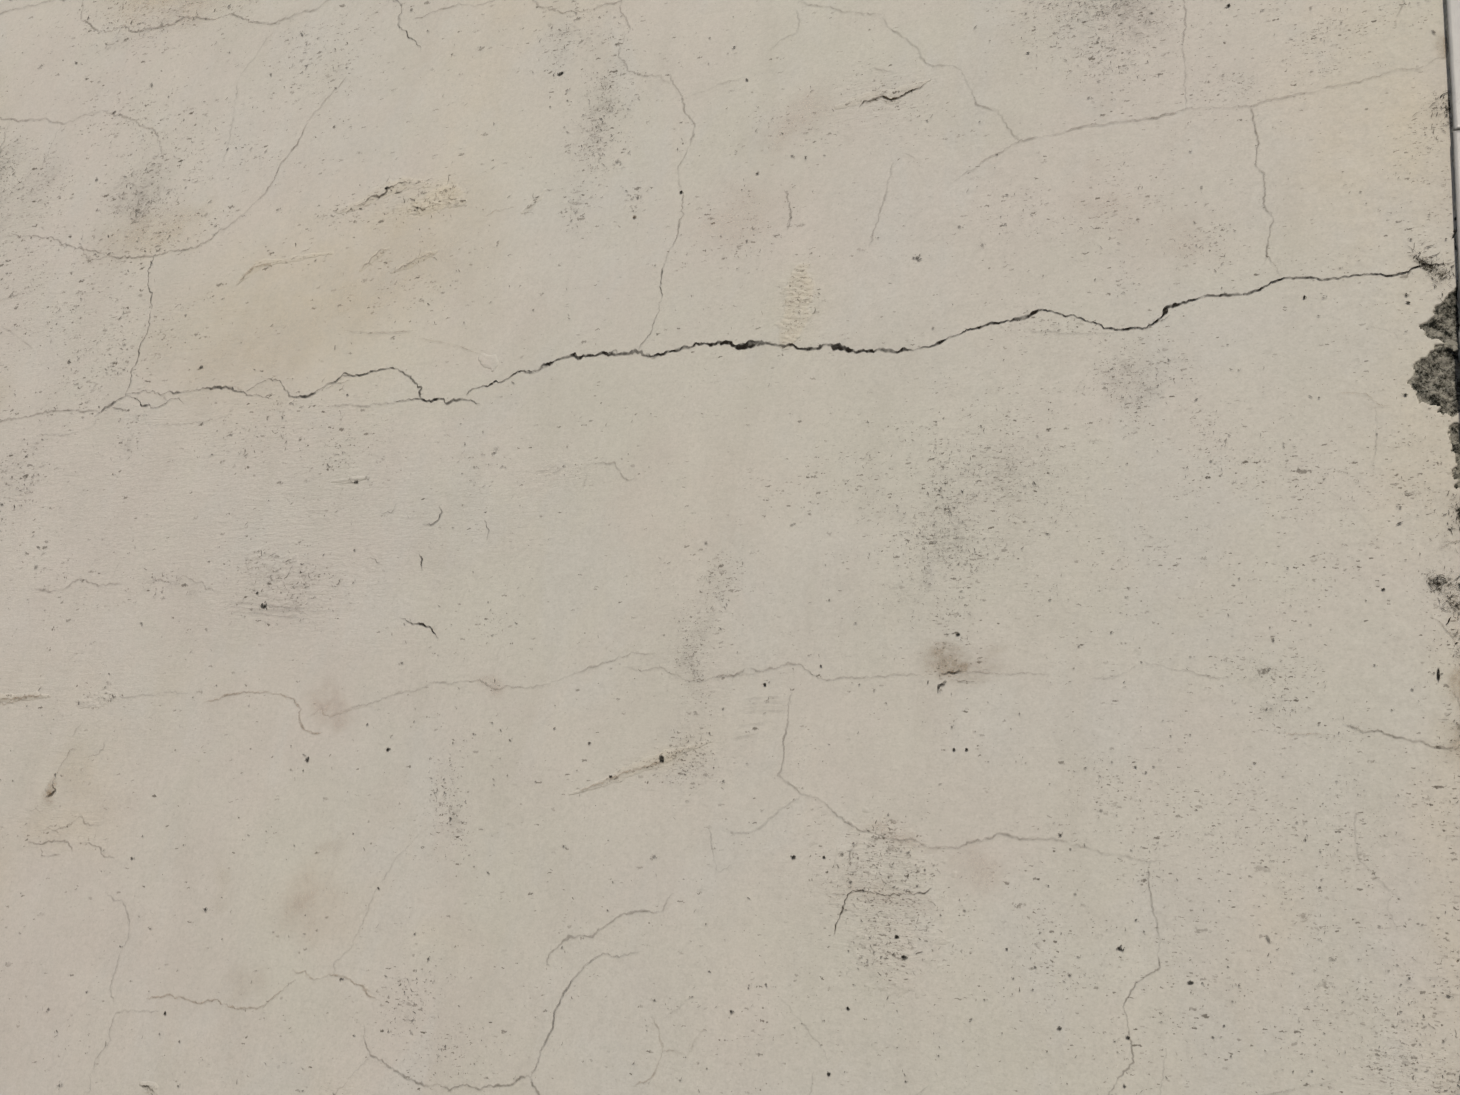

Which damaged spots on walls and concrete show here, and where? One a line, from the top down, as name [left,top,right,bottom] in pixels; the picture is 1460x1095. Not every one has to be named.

crack [101,263,1443,412]
spalling [1403,287,1460,489]
mould [1426,570,1460,657]
crack [835,890,929,929]